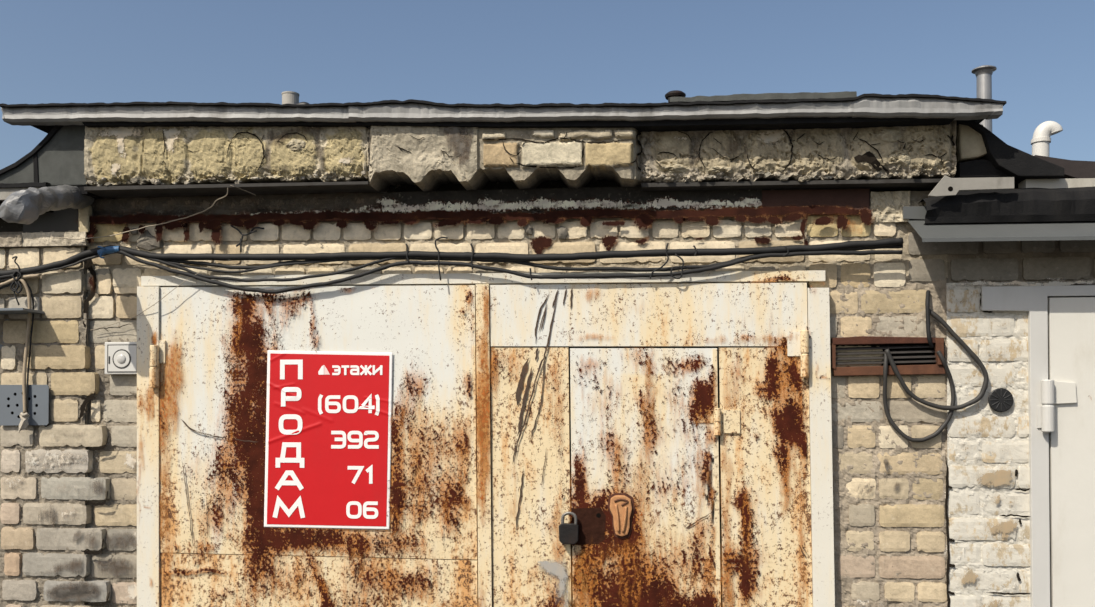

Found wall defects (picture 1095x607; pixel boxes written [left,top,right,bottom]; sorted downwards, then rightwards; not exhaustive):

crack [144,128,308,174]
spalling [87,170,366,186]
corrosion [87,205,872,254]
corrosion [140,345,183,452]
corrosion [151,286,529,607]
corrosion [530,323,830,607]